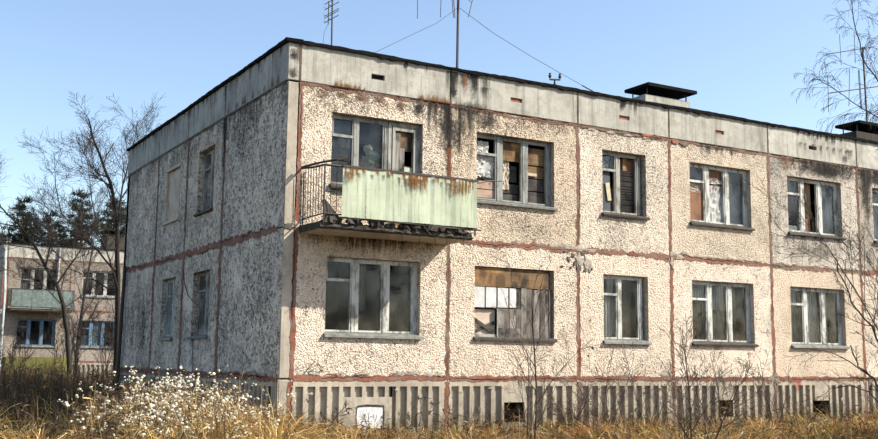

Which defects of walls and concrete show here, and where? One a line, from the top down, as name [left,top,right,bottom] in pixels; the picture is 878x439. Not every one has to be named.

damp [415,71,497,155]
rust [345,148,474,198]
damp [783,142,878,221]
spalling [549,243,597,273]